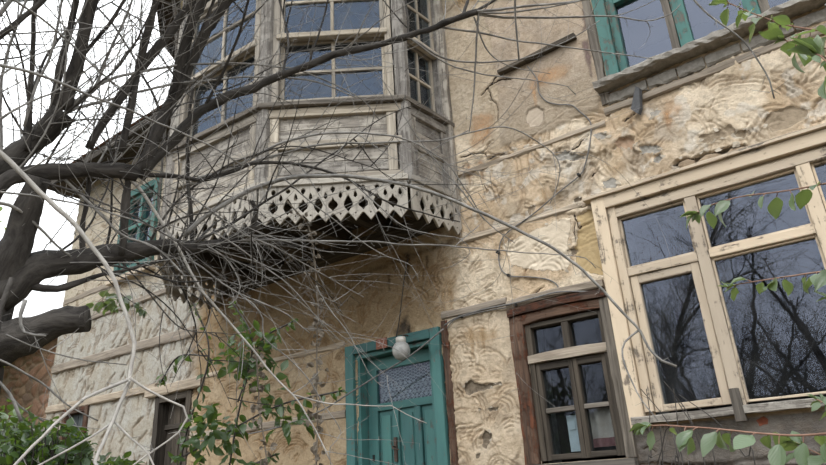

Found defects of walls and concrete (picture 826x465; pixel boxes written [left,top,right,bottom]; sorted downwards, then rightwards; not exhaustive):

crack [481,77,511,113]
flaking render [763,106,810,131]
flaking render [593,131,666,163]
spalling [673,124,752,168]
spalling [463,380,502,395]
spalling [476,430,492,458]